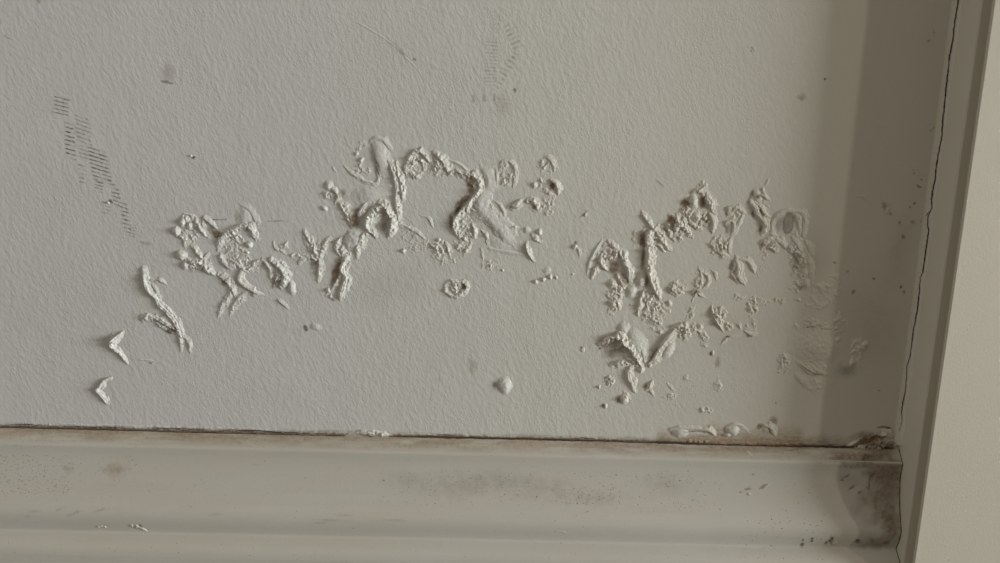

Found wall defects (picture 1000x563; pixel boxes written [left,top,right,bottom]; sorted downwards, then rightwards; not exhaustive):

crack [0,424,345,437]
crack [389,0,959,562]